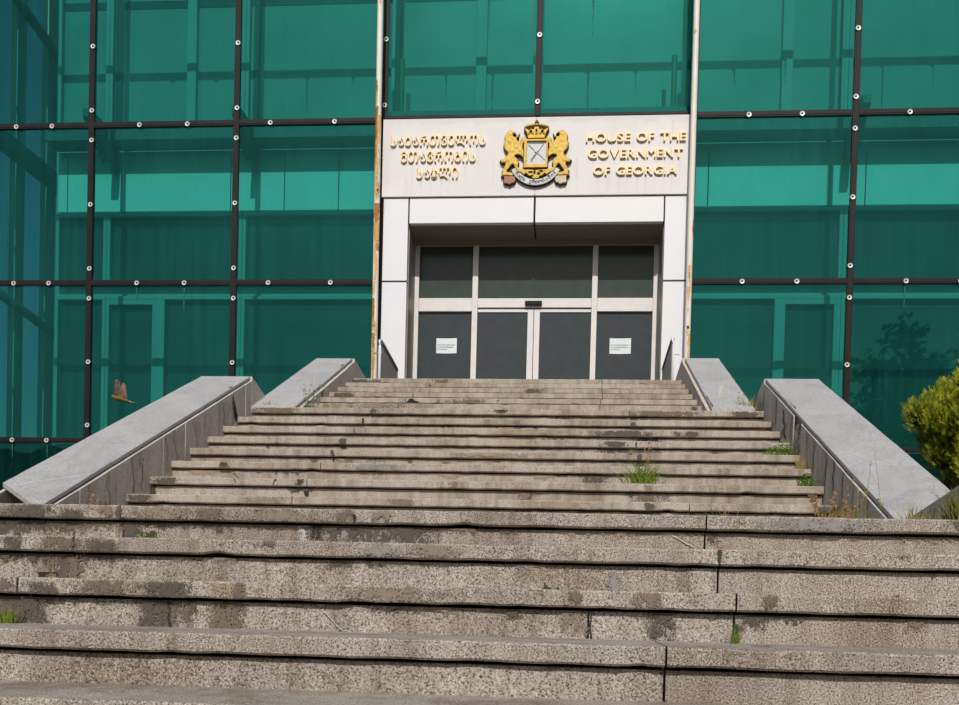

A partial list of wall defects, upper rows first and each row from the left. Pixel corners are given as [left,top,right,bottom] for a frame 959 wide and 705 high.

rust [371,80,381,378]
crack [762,386,807,460]